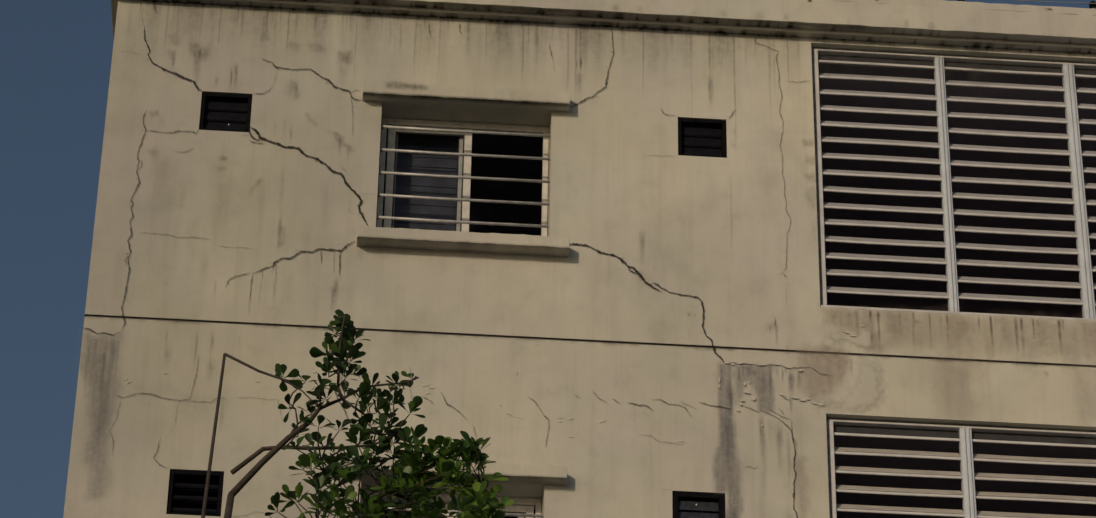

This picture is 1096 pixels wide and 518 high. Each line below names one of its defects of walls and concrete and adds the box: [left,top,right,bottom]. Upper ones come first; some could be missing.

crack [144,7,201,91]
crack [256,59,358,100]
crack [571,32,614,107]
crack [227,127,368,295]
crack [569,243,825,375]
crack [598,397,798,518]